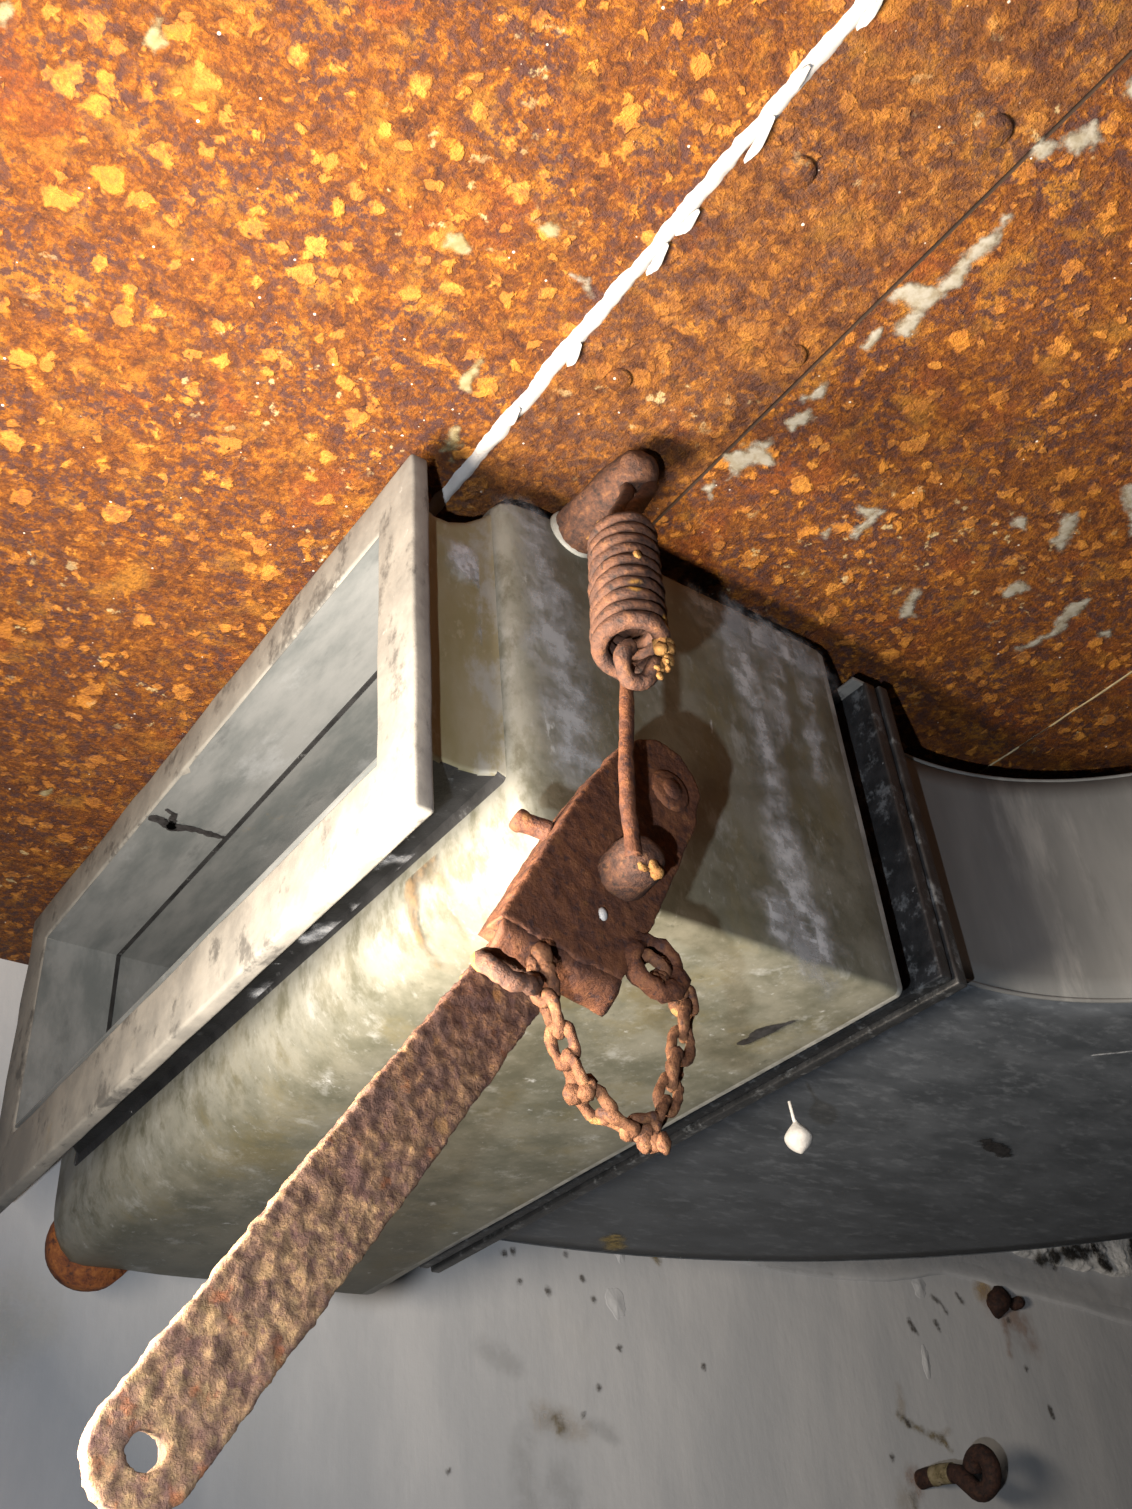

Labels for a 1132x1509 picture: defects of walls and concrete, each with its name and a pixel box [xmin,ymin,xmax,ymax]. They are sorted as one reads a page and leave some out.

peeling [780,64,811,98]
peeling [744,114,776,164]
peeling [1032,120,1100,159]
peeling [862,215,1010,349]
peeling [785,385,826,432]
peeling [724,442,774,474]
peeling [851,508,884,538]
peeling [1051,513,1078,549]
peeling [900,590,921,618]
peeling [1003,582,1029,598]
rust [618,629,644,638]
peeling [1016,599,1090,649]